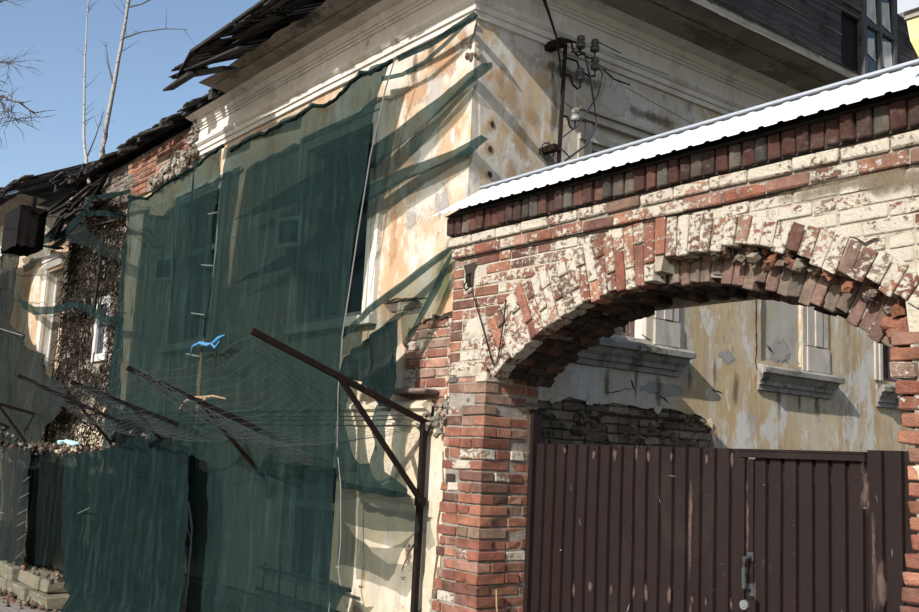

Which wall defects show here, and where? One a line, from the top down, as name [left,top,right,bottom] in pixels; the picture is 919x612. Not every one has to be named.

spalling [465,22,481,62]
damp [402,56,426,110]
peeling [409,117,444,164]
flaking render [84,130,194,223]
peeling [405,179,449,229]
spalling [464,262,477,287]
spalling [688,245,882,303]
spalling [883,297,906,319]
spalling [538,396,714,463]